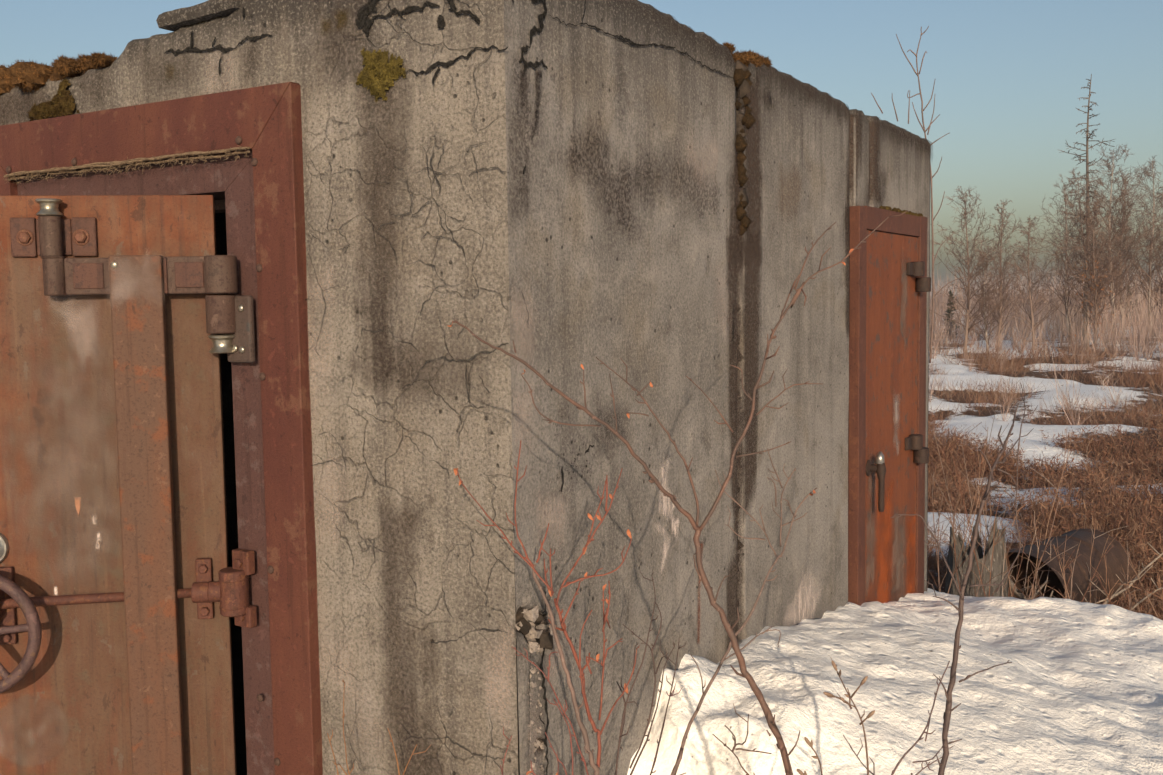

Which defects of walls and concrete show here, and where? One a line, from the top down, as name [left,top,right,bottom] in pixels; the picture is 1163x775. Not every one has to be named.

crack [164,7,272,76]
crack [405,0,735,85]
crack [376,125,526,315]
leakage [569,131,717,237]
leakage [771,69,932,331]
crack [305,284,340,355]
crack [355,291,531,409]
leakage [727,77,772,649]
crack [311,432,347,485]
spalling [515,604,553,775]